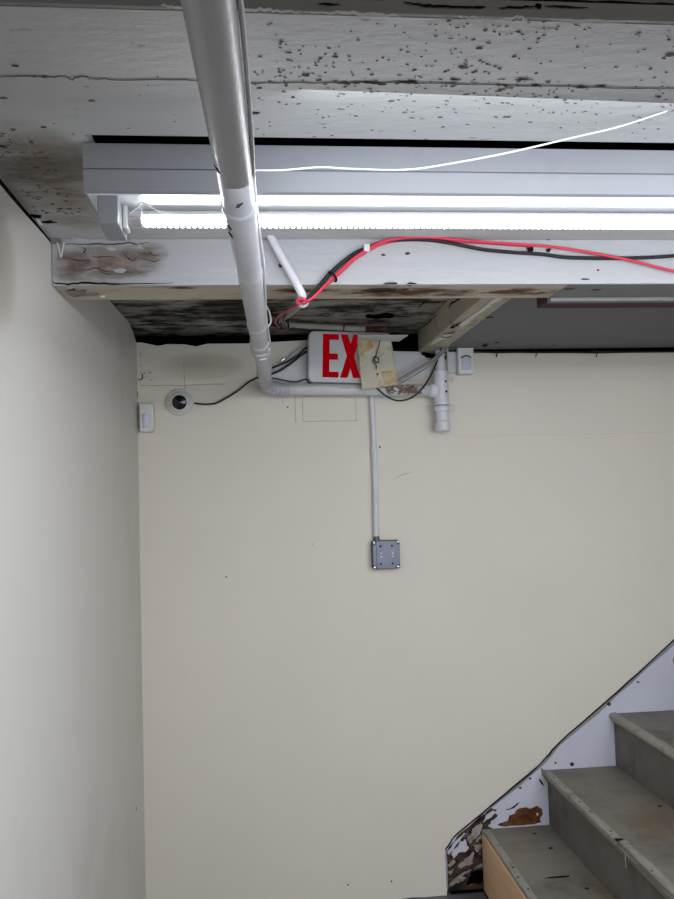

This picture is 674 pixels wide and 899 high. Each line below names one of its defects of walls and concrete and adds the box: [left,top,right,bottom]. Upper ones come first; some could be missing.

peeling [446,803,543,892]